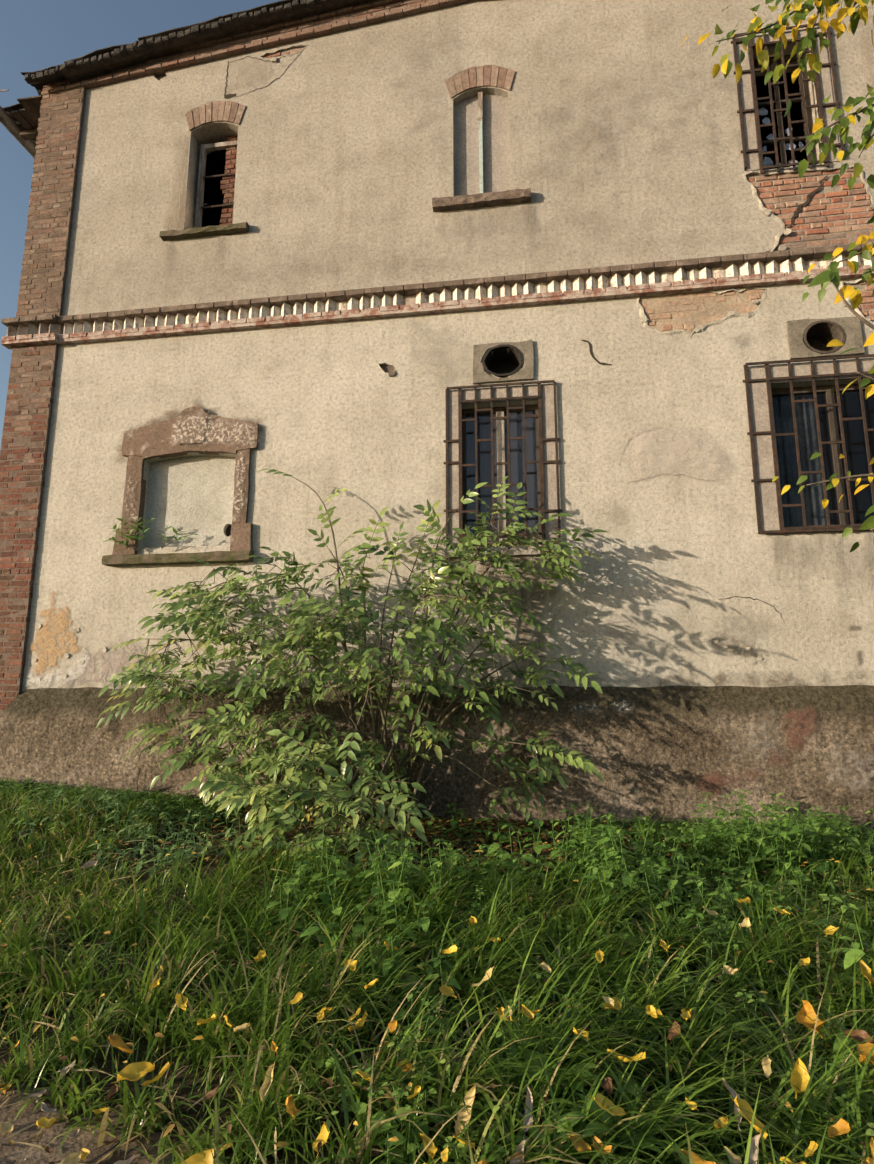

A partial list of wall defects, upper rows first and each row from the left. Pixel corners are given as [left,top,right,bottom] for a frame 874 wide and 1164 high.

crack [224,51,302,99]
spalling [742,164,874,252]
spalling [636,287,768,338]
spalling [377,362,397,377]
crack [582,340,612,365]
peeling [25,593,171,688]